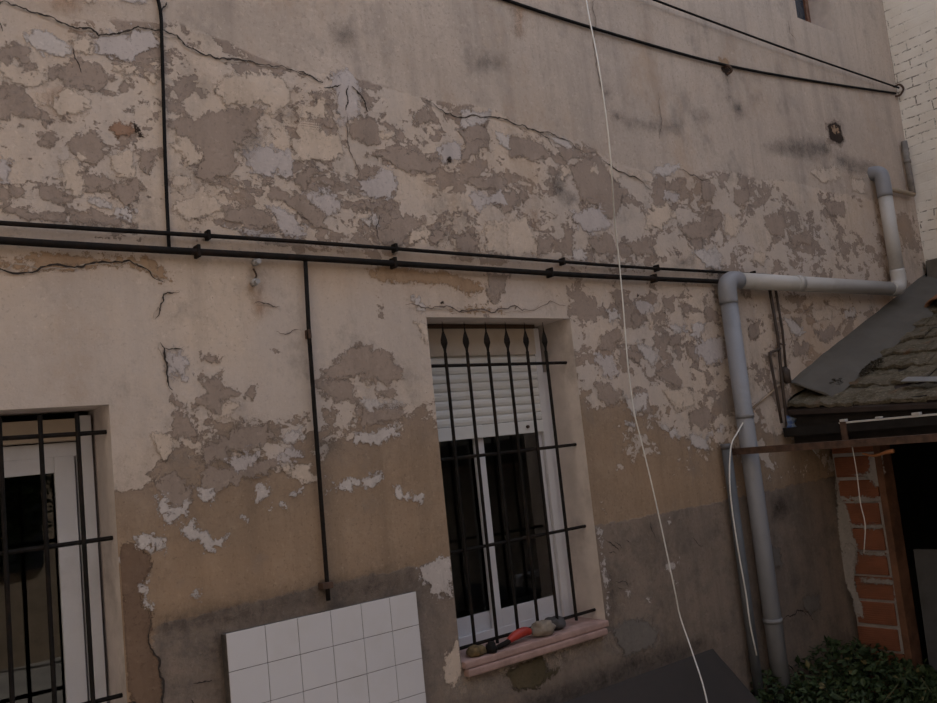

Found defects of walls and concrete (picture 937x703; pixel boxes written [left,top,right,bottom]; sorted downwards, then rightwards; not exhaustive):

crack [0,0,368,176]
peeling [0,23,751,270]
crack [426,100,651,190]
spalling [824,119,845,148]
spalling [0,250,173,284]
crack [0,259,179,318]
crack [158,343,183,393]
spalling [366,265,511,346]
peeling [593,285,726,451]
peeling [781,293,856,364]
spalling [119,341,425,703]